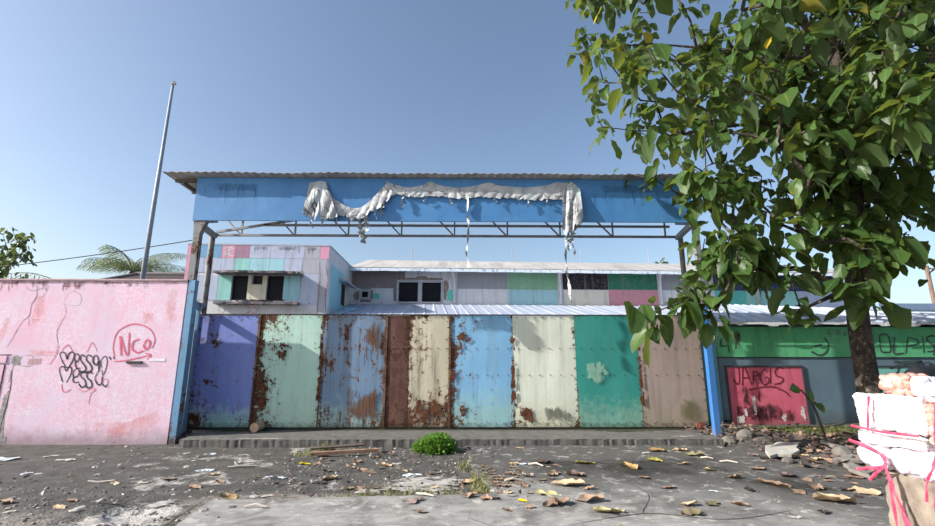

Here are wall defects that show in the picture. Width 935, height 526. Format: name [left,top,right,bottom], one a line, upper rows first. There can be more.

rust [254,332,289,416]
rust [316,315,325,416]
rust [339,388,377,422]
rust [364,320,383,363]
rust [408,370,467,423]
rust [510,337,535,424]
rust [545,408,571,422]
peeling [586,362,608,383]